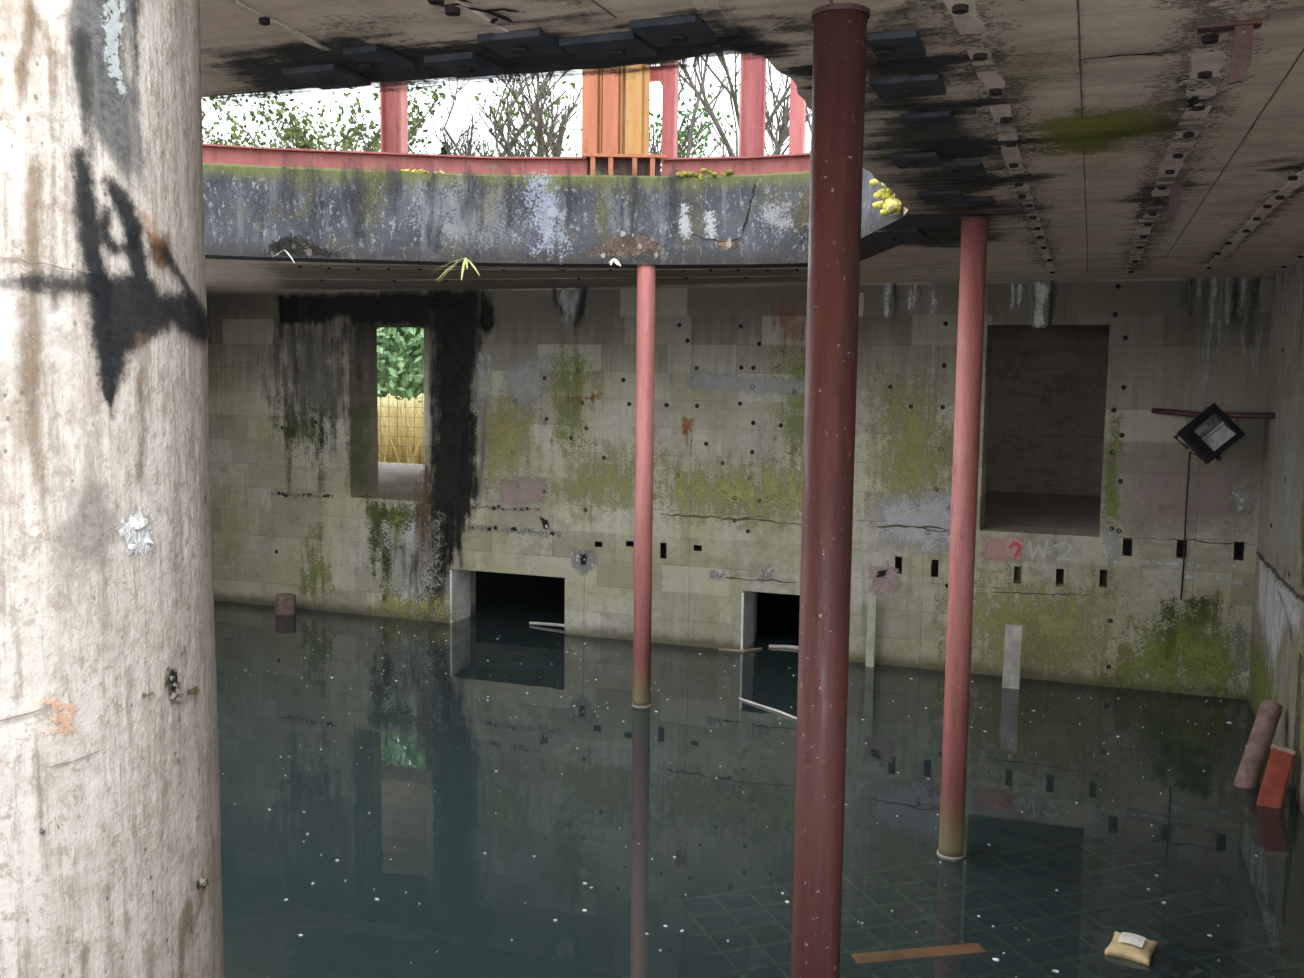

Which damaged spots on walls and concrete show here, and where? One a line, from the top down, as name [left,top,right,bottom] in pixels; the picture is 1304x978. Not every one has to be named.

leakage [16,0,143,176]
leakage [864,24,1071,248]
leakage [655,268,807,285]
leakage [257,311,361,487]
leakage [273,265,637,612]